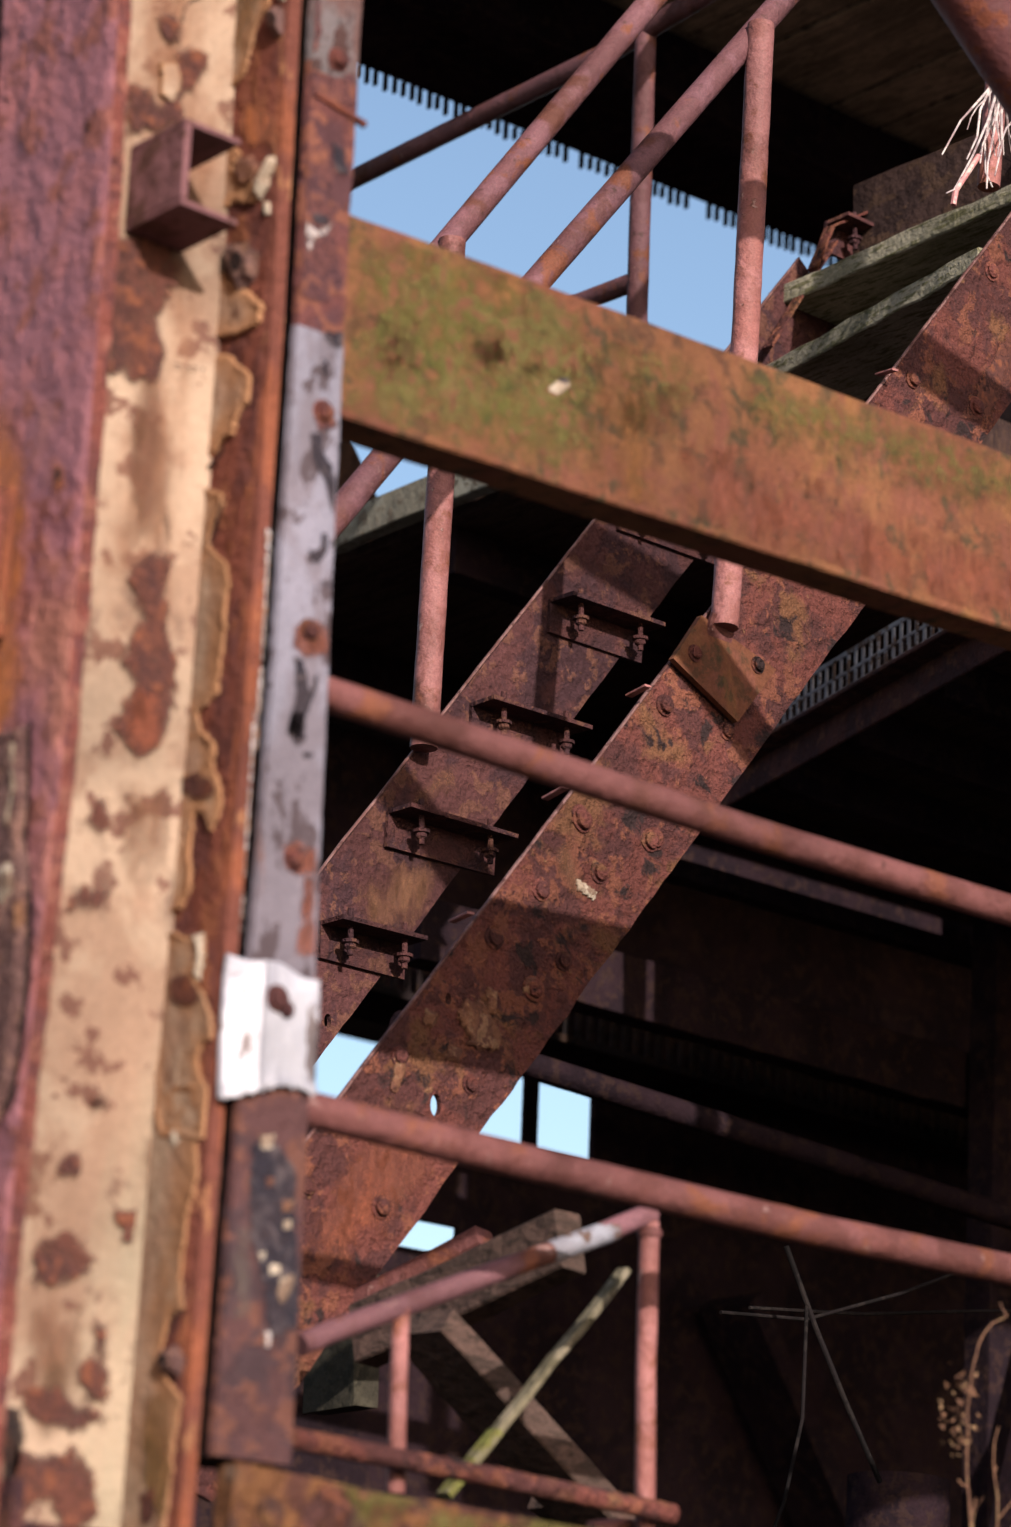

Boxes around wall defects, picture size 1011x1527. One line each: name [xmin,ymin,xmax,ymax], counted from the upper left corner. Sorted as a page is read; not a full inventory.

rust [312,72,357,105]
peeling [223,148,276,215]
peeling [208,272,264,457]
peeling [170,488,231,913]
rust [86,797,112,833]
rust [0,724,31,1115]
rust [68,884,110,910]
rust [560,849,597,901]
rust [56,1152,81,1176]
rust [32,1230,97,1286]
peeling [120,931,214,1527]
rust [11,1315,110,1527]